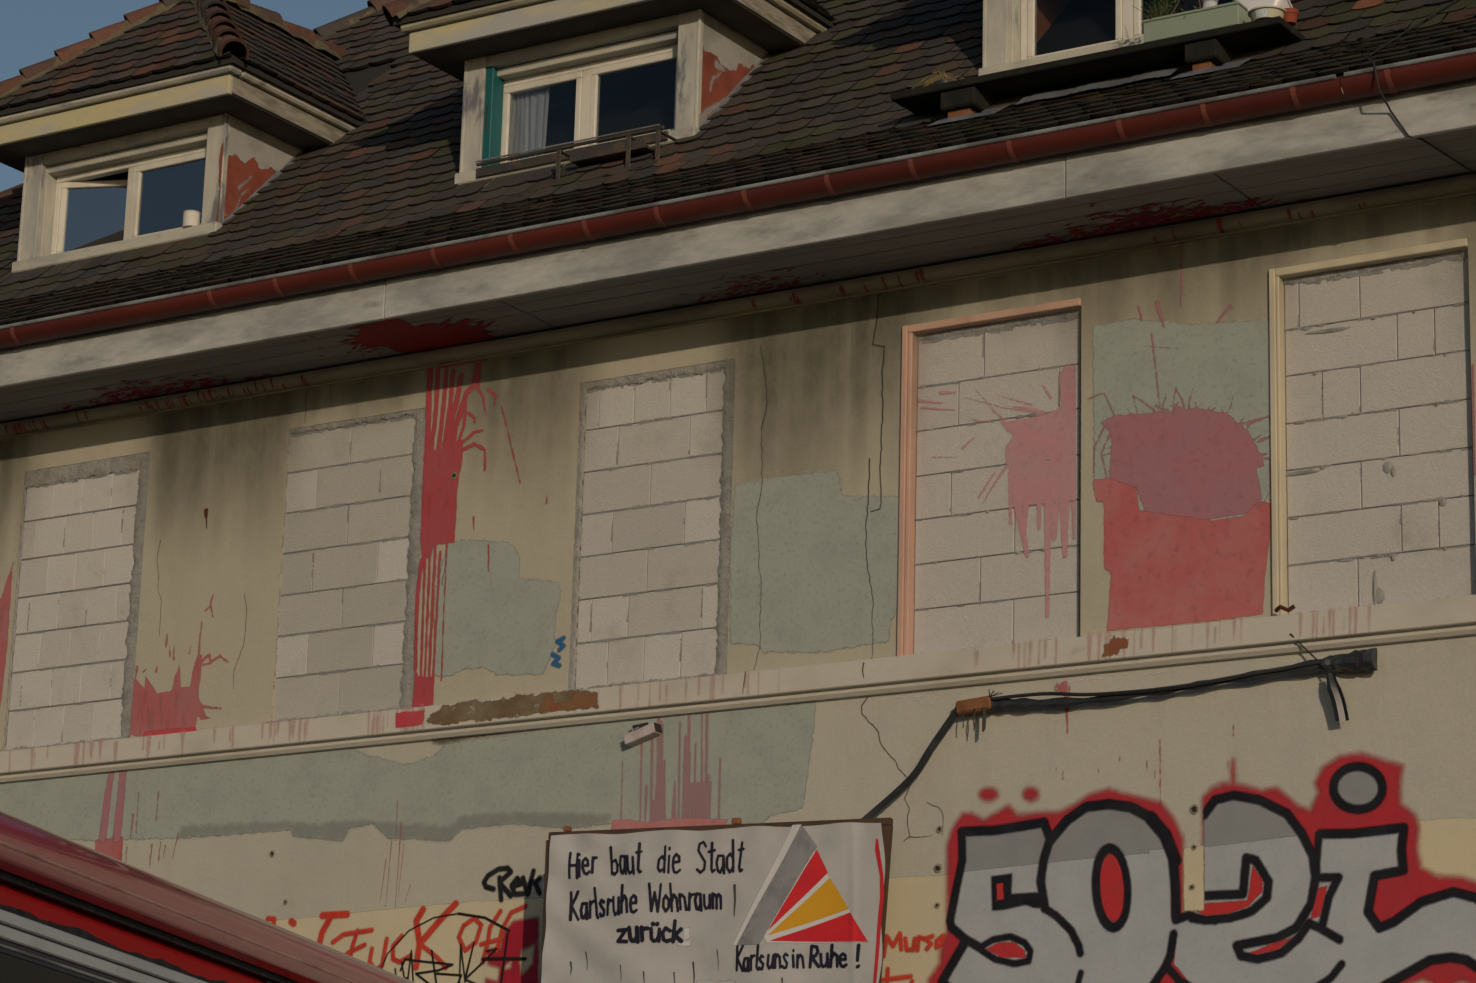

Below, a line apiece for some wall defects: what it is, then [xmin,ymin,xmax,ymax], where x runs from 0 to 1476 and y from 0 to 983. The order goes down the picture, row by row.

spalling [426,689,599,726]
crack [861,289,943,841]